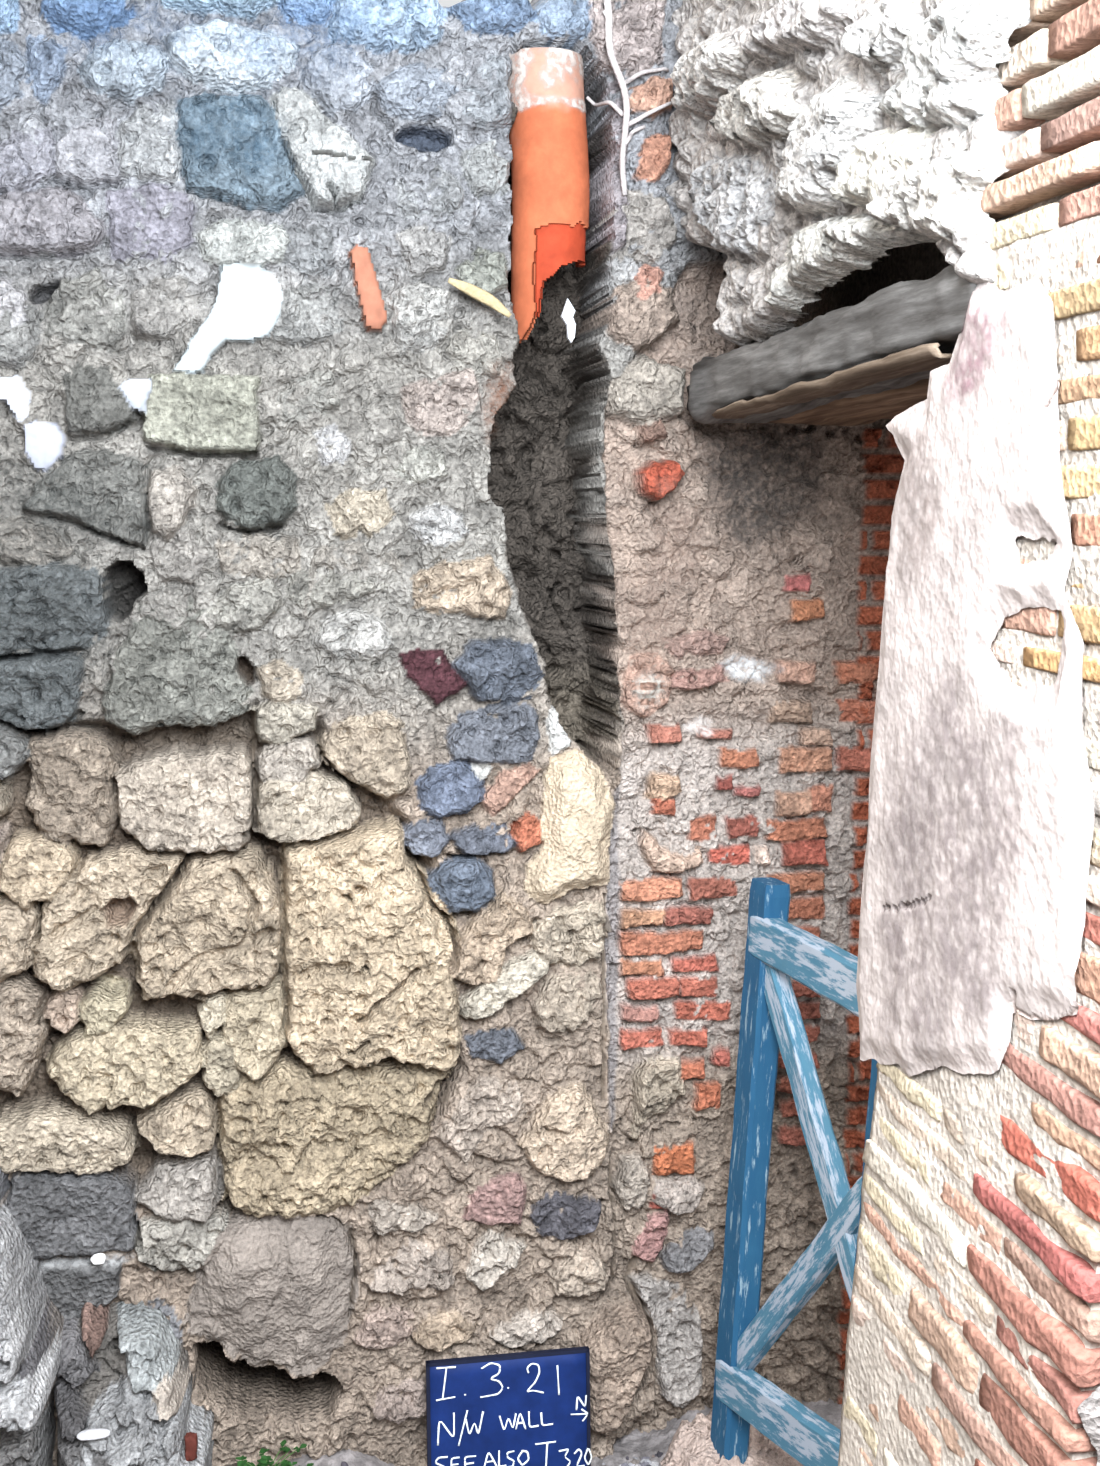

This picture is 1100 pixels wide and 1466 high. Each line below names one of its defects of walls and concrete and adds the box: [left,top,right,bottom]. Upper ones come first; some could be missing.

crack [314,149,374,162]
flaking render [856,276,1094,1077]